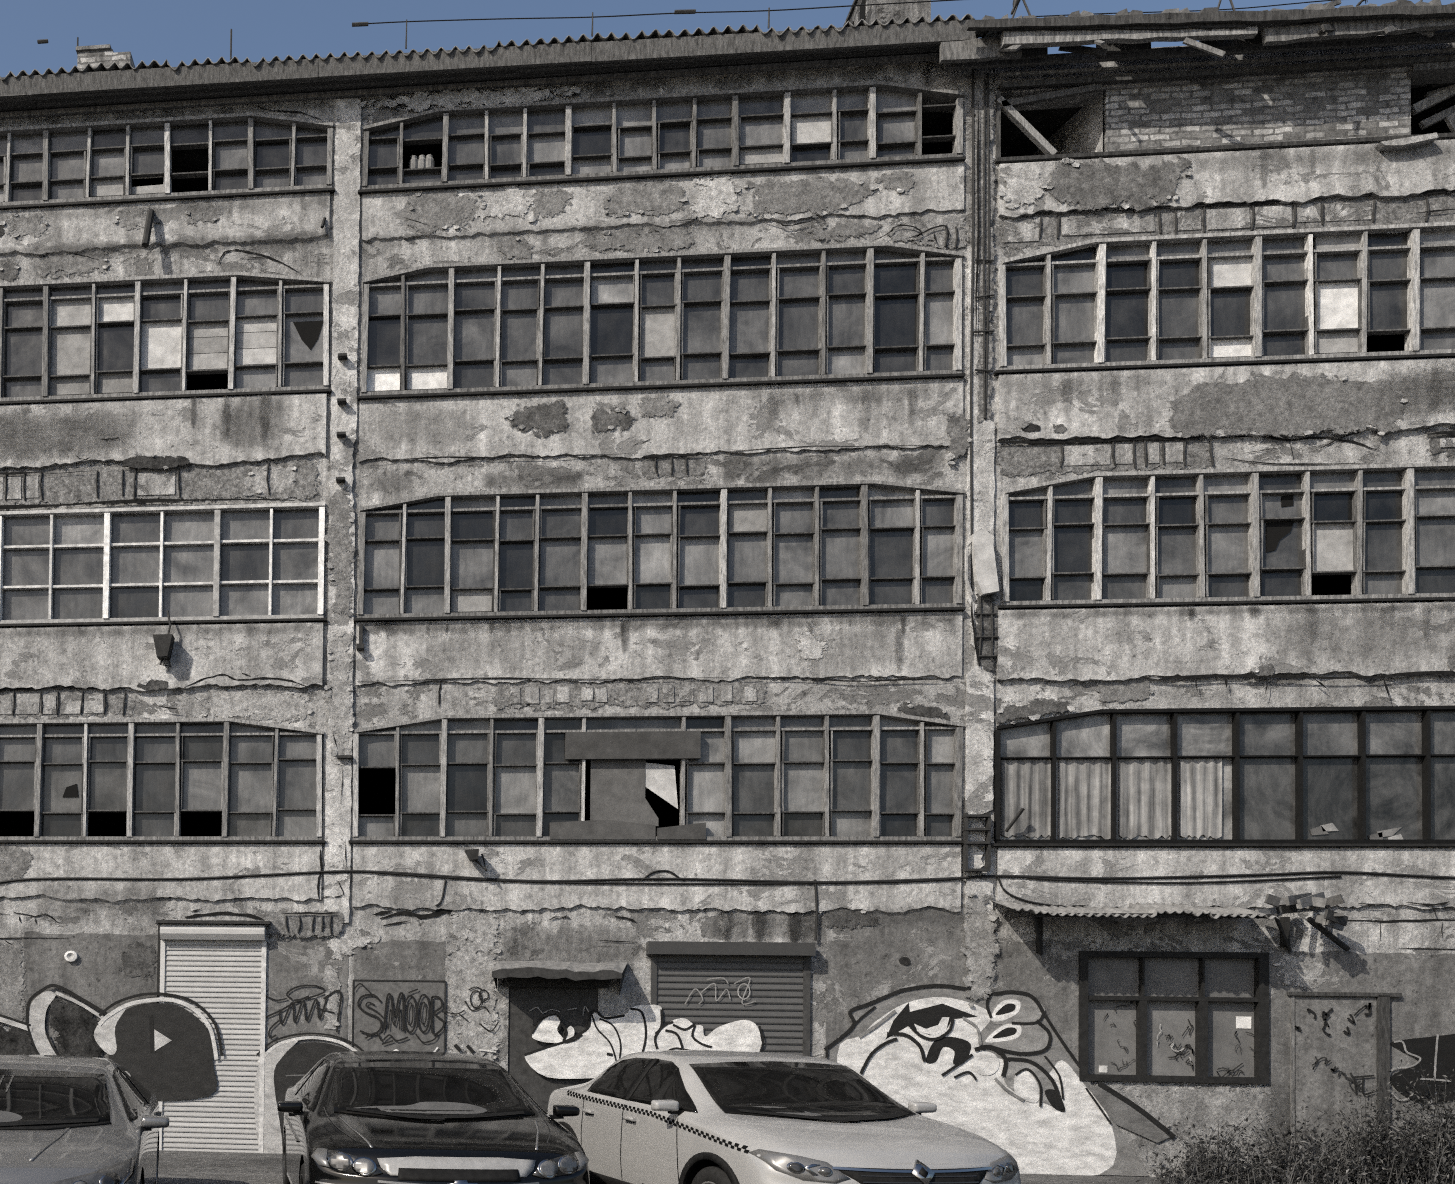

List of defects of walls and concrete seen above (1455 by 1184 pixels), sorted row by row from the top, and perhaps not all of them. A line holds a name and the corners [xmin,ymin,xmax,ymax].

peeling [0,213,48,240]
peeling [114,207,160,231]
peeling [185,200,220,226]
peeling [0,258,20,282]
peeling [39,248,111,278]
spalling [581,68,1455,479]
peeling [502,399,569,438]
crack [1211,430,1380,465]
crack [1145,671,1455,698]
peeling [818,908,878,931]